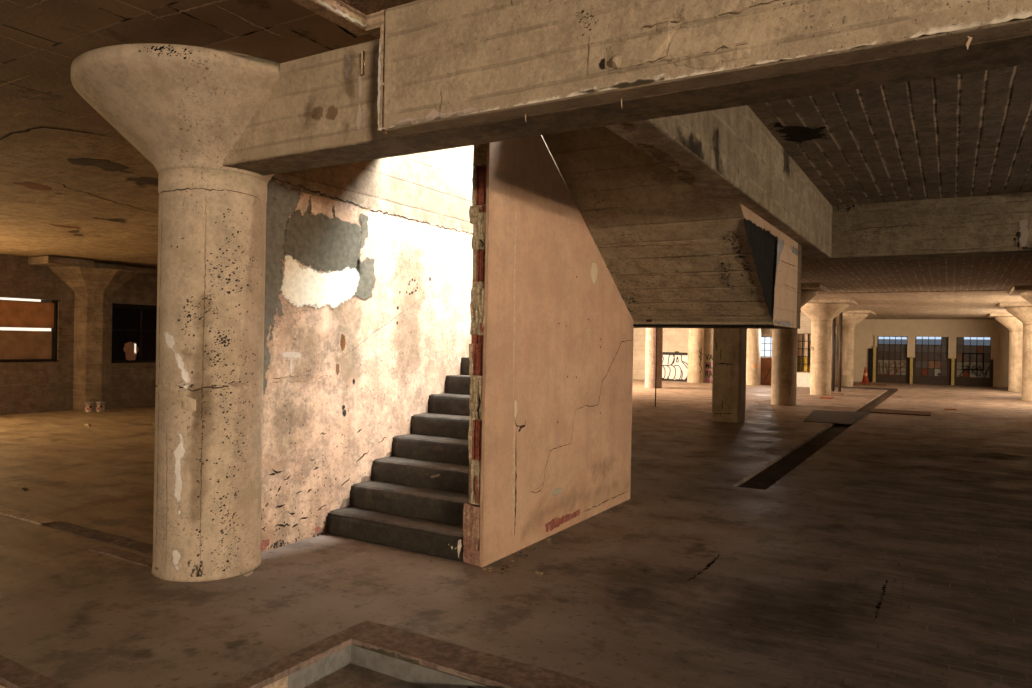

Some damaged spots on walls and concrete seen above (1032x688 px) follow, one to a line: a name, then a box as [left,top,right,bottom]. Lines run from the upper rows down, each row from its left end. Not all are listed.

crack [0,127,110,140]
spalling [176,209,262,572]
flaking render [280,255,359,309]
spalling [260,399,392,550]
spalling [451,143,487,566]
crack [529,340,633,493]